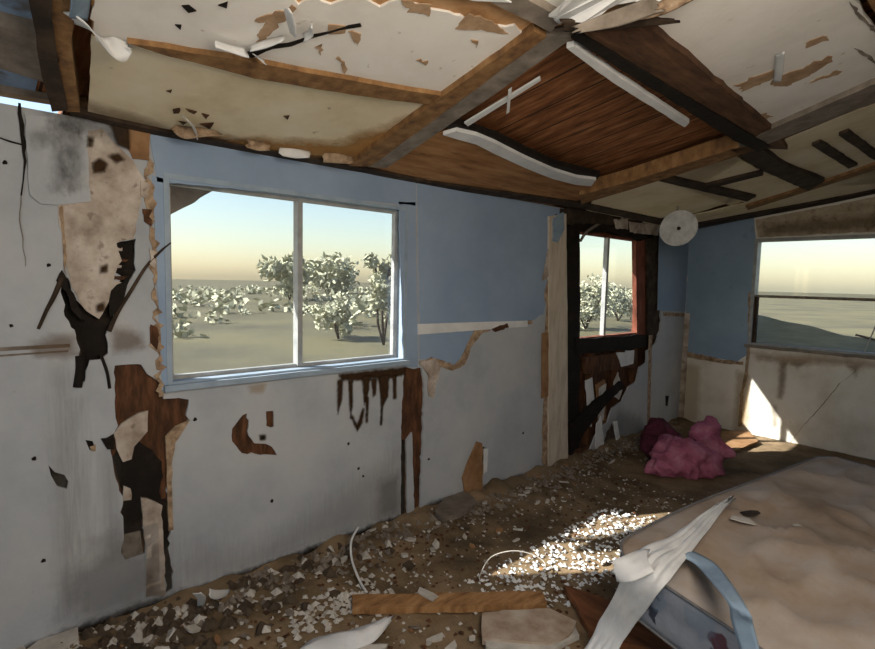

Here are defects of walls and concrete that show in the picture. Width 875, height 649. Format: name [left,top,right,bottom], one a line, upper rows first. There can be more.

peeling [255,5,296,43]
peeling [455,13,509,47]
peeling [733,51,842,92]
peeling [245,140,311,158]
crack [0,103,27,266]
peeling [24,114,91,320]
peeling [109,247,130,317]
water stain [337,367,406,431]
peeling [585,350,634,405]
peeling [90,410,148,462]
peeling [232,411,276,455]
peeling [122,420,190,596]